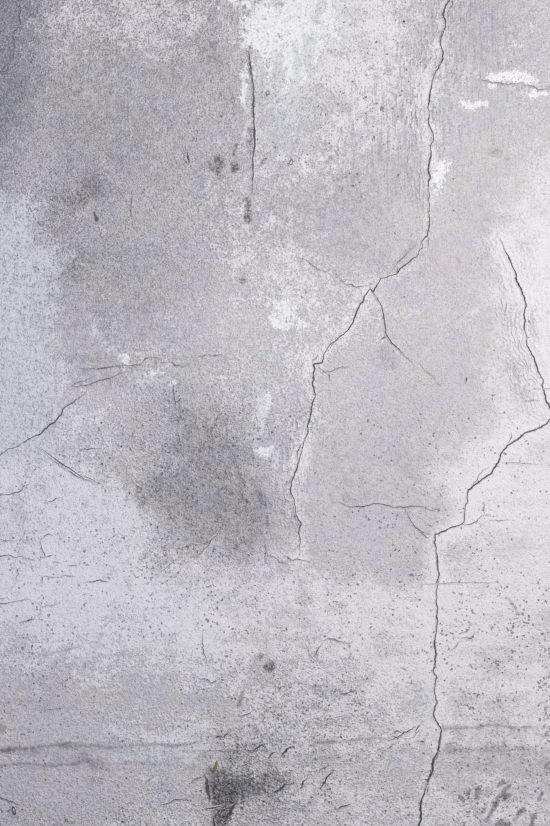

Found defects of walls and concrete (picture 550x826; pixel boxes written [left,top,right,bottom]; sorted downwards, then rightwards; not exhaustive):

crack [478,79,550,91]
crack [264,0,454,566]
crack [0,354,223,457]
crack [3,476,31,496]
crack [44,496,61,504]
crack [336,238,550,826]
crack [0,532,113,623]
crack [311,637,352,659]
crack [297,763,335,791]